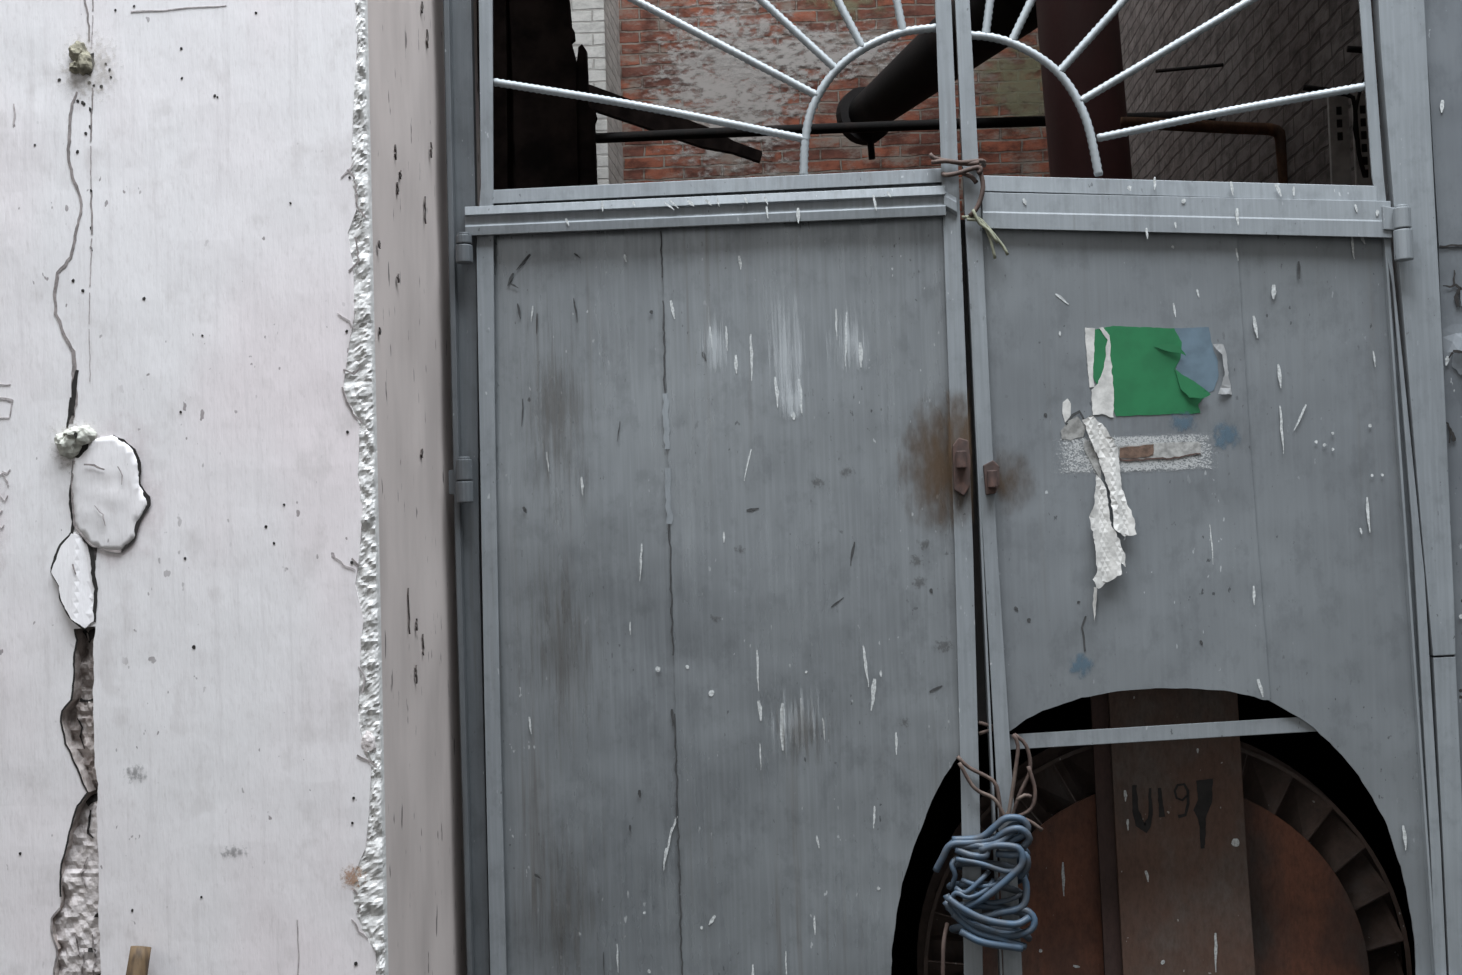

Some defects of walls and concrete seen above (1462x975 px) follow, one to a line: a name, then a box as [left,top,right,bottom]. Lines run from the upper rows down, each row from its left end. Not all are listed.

crack [84,0,94,48]
crack [53,88,94,534]
peeling [1443,270,1462,307]